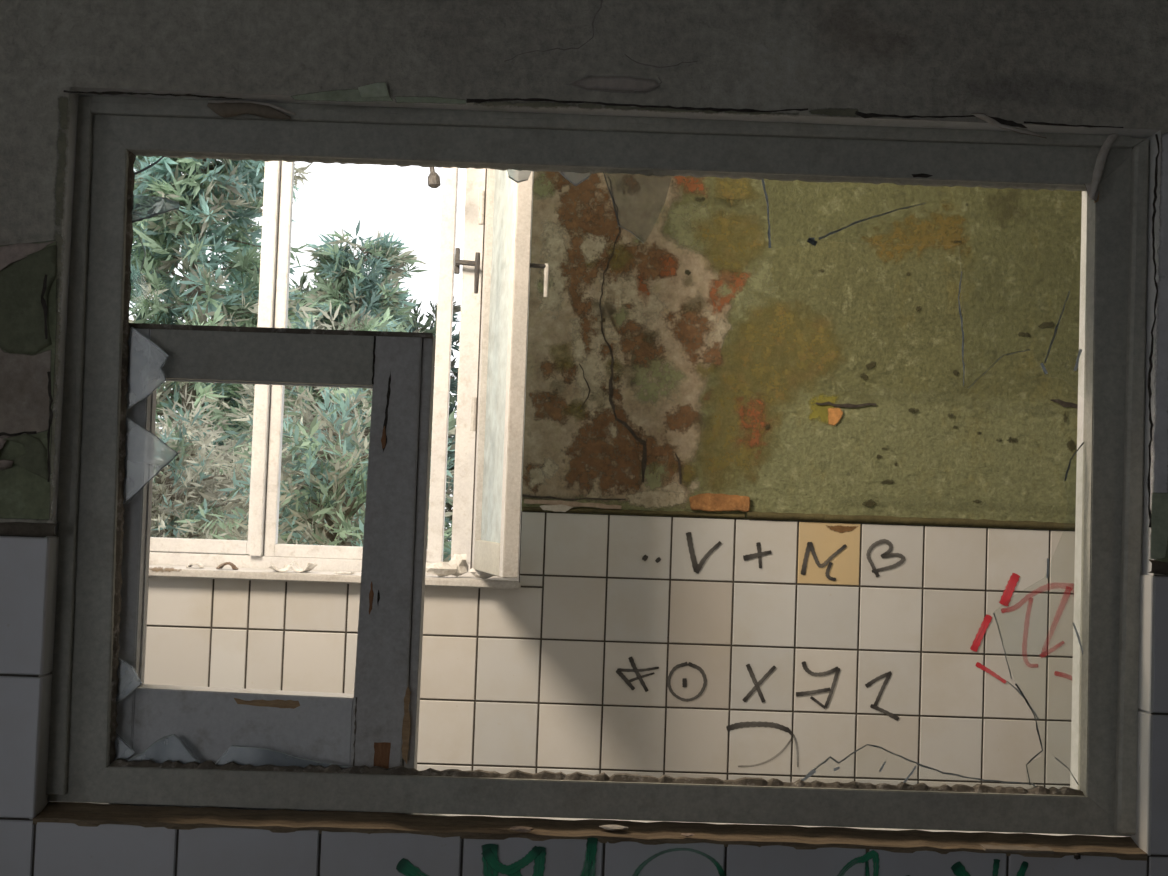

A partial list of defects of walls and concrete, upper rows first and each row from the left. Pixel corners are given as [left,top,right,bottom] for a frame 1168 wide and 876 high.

peeling [0,97,69,520]
crack [522,172,647,501]
spalling [522,171,772,512]
crack [674,453,682,484]
peeling [1150,493,1168,562]